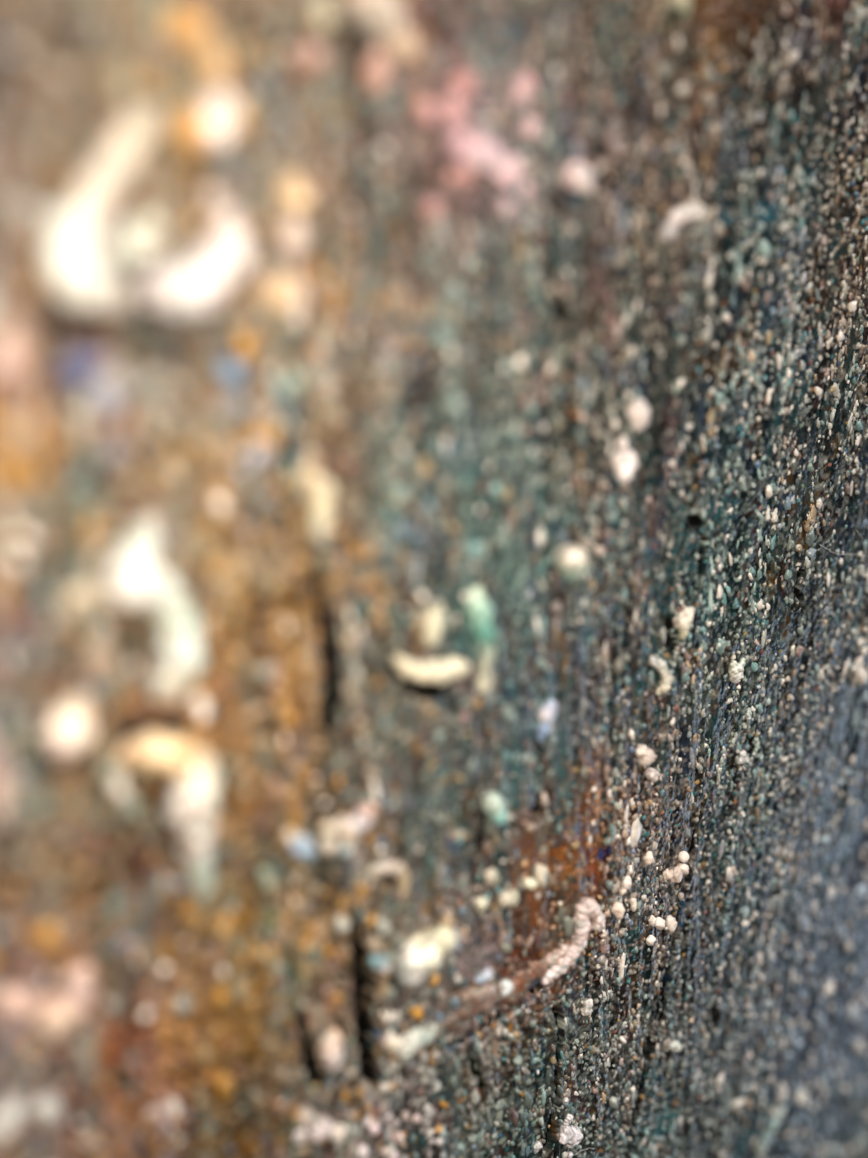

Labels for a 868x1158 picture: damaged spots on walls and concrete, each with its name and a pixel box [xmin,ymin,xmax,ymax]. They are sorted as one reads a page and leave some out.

crack [679,515,705,590]
crack [664,616,673,648]
crack [624,810,701,1158]